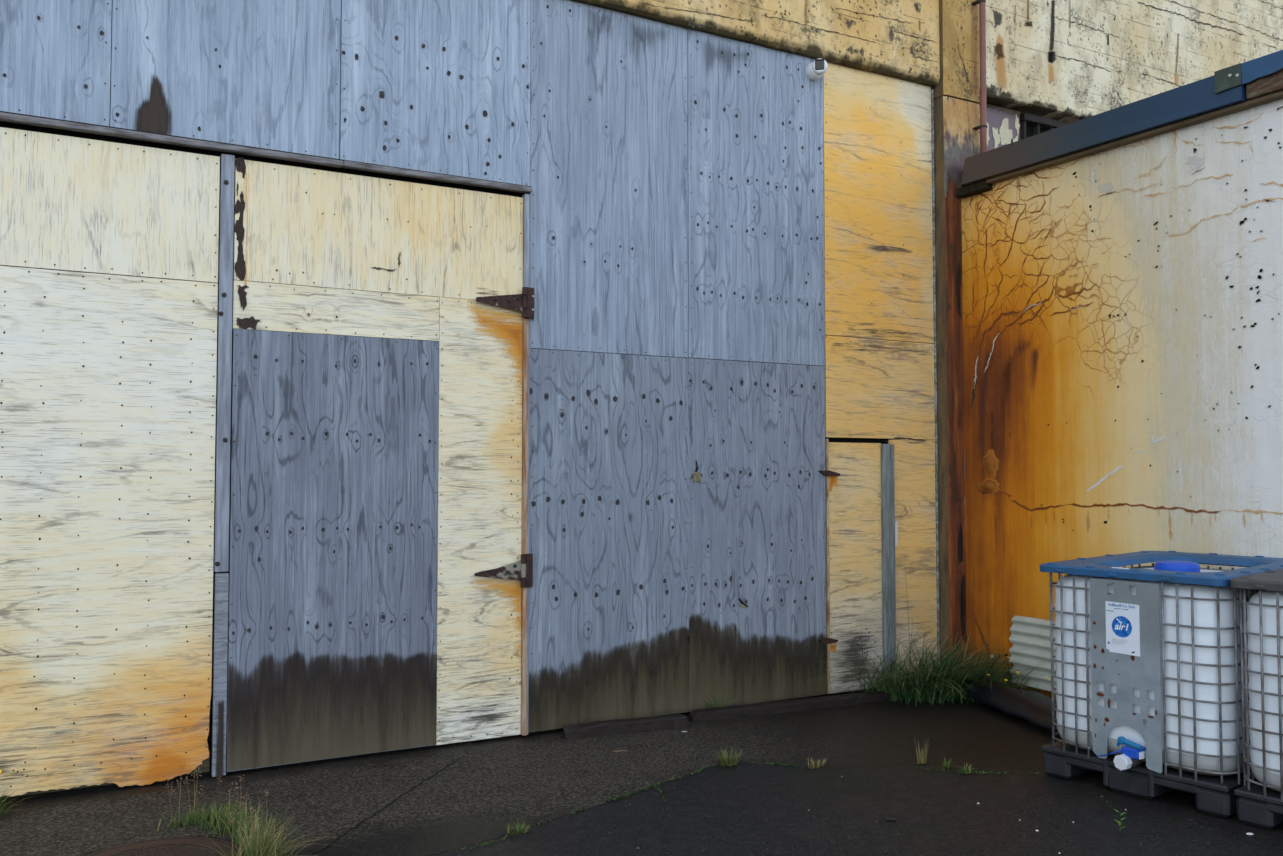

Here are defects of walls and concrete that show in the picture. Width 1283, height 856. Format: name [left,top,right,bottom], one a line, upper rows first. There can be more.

water stain [135,74,171,135]
peeling [234,157,261,330]
crack [966,106,1283,407]
rust [469,301,522,404]
rust [957,138,1229,699]
crack [996,491,1283,539]
water stain [216,652,437,776]
water stain [528,615,827,733]